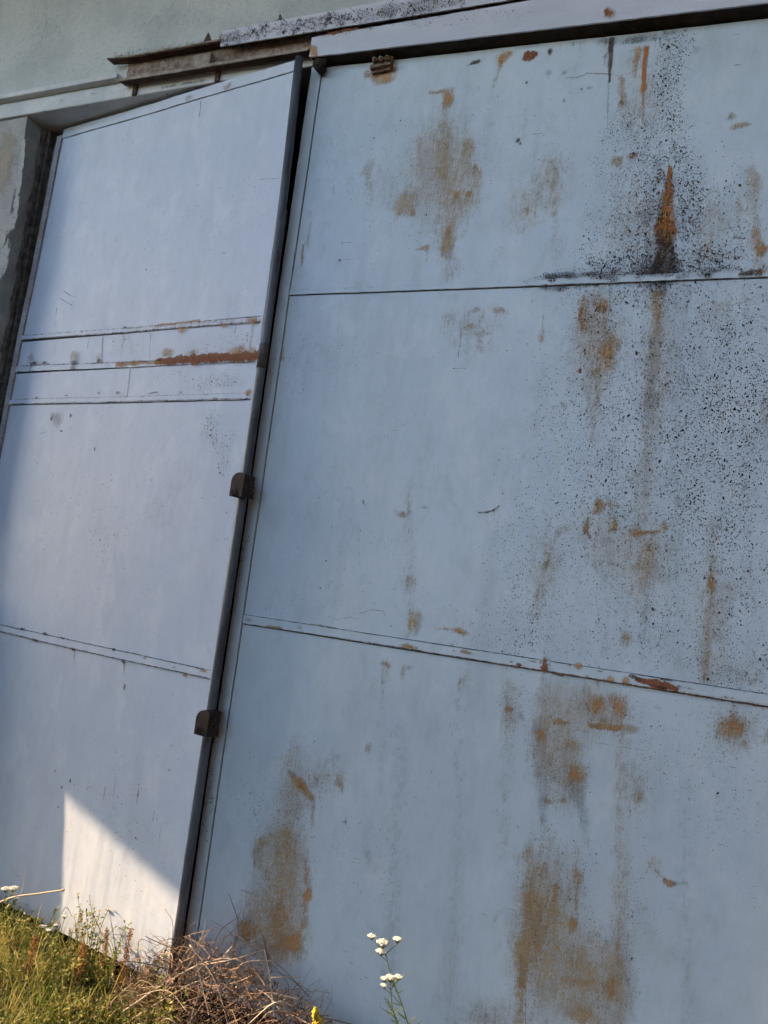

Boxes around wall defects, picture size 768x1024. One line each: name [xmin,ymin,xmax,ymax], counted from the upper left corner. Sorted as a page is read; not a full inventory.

rust [634,46,648,102]
rust [644,166,700,327]
rust [22,347,259,370]
rust [579,299,607,334]
rust [245,624,768,787]
rust [289,771,313,798]
rust [239,831,311,961]
rust [515,872,622,1024]